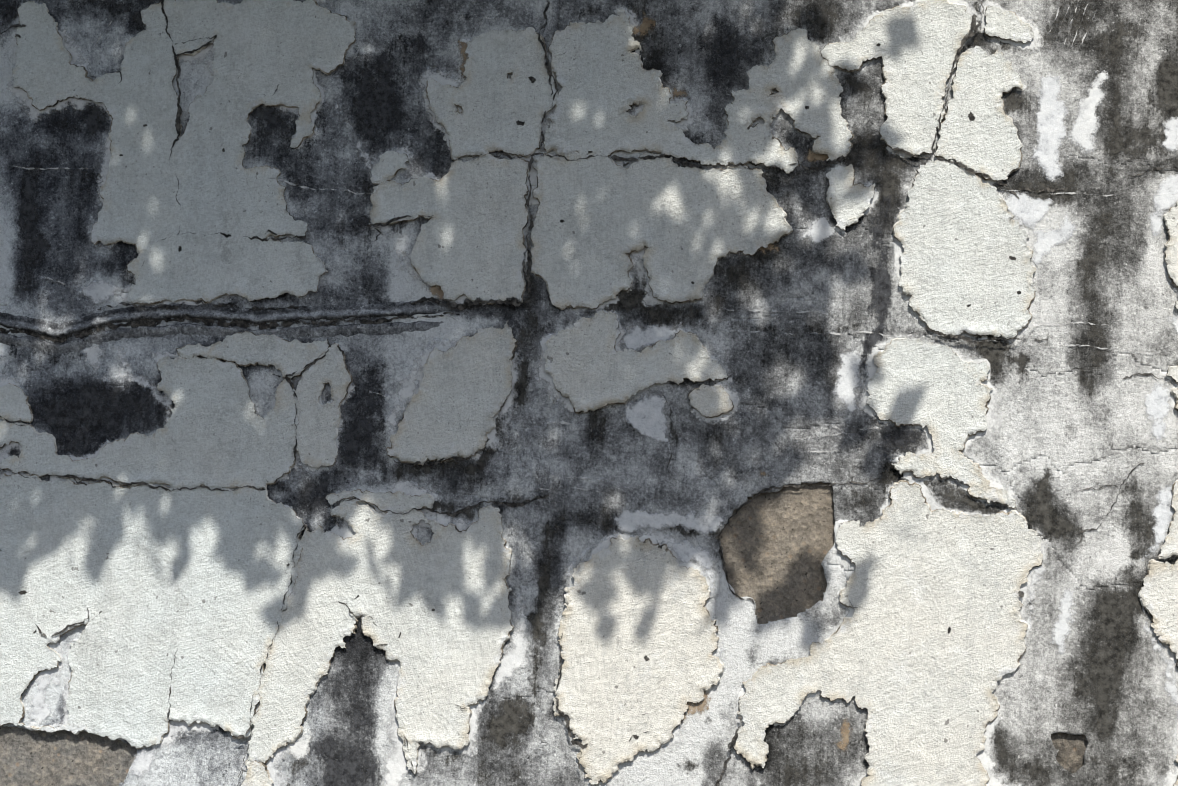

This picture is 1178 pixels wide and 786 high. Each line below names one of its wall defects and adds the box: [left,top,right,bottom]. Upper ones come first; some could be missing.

crack [0,0,847,466]
peeling [0,0,927,325]
water stain [730,72,918,382]
crack [893,1,1065,199]
water stain [992,167,1084,208]
peeling [0,318,318,461]
peeling [262,57,1012,786]
peeling [948,0,1178,786]
spalling [0,625,260,786]
water stain [287,623,383,786]
water stain [477,503,617,786]
water stain [1073,482,1156,745]